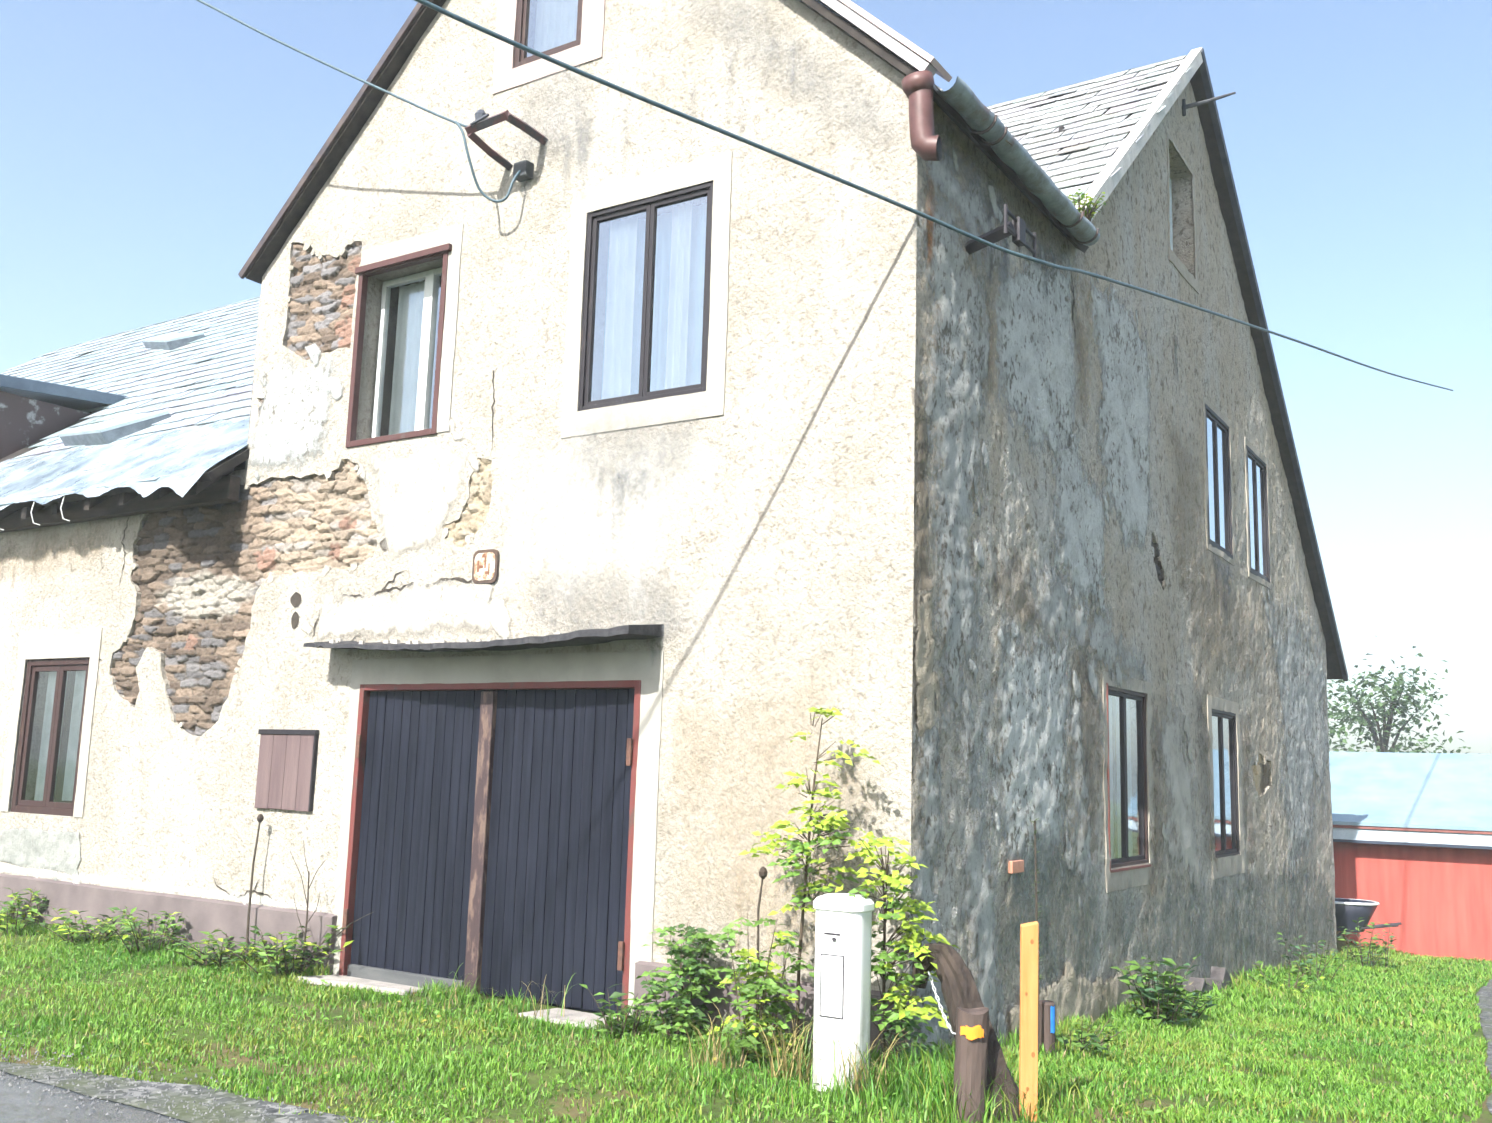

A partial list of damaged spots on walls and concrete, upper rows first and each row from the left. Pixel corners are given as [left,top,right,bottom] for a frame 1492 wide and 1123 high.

flaking render [111,241,511,736]
peeling [905,148,1166,1061]
damp [1004,841,1101,985]